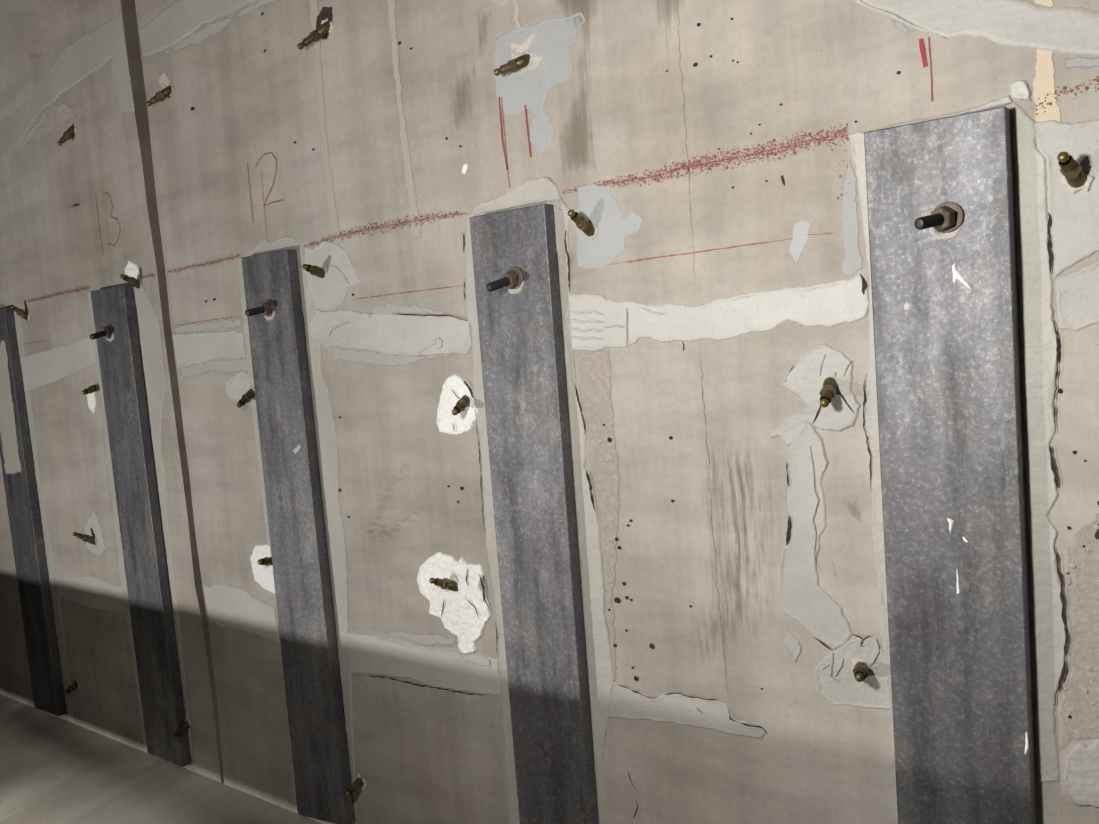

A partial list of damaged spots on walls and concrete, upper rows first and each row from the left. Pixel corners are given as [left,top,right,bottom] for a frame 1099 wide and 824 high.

spalling [158,71,171,89]
spalling [316,7,333,40]
spalling [510,33,542,74]
crack [1046,213,1054,274]
crack [1049,321,1059,488]
spalling [576,351,620,681]
crack [1054,547,1069,705]
spalling [1059,514,1099,749]